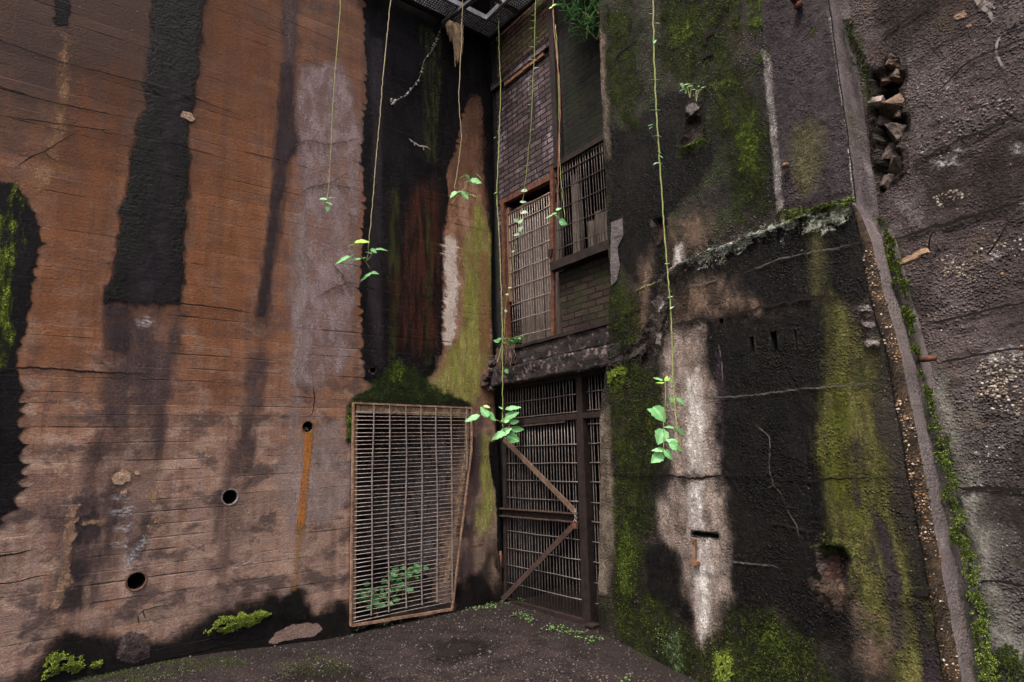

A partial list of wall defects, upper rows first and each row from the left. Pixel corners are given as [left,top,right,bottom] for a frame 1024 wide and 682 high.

leakage [256,0,493,404]
leakage [894,197,923,226]
spalling [865,31,1024,321]
leakage [56,0,205,612]
leakage [225,351,266,490]
rust [297,432,312,529]
leakage [598,33,903,671]
crack [608,425,903,535]
crack [701,345,876,398]
spalling [813,534,854,603]